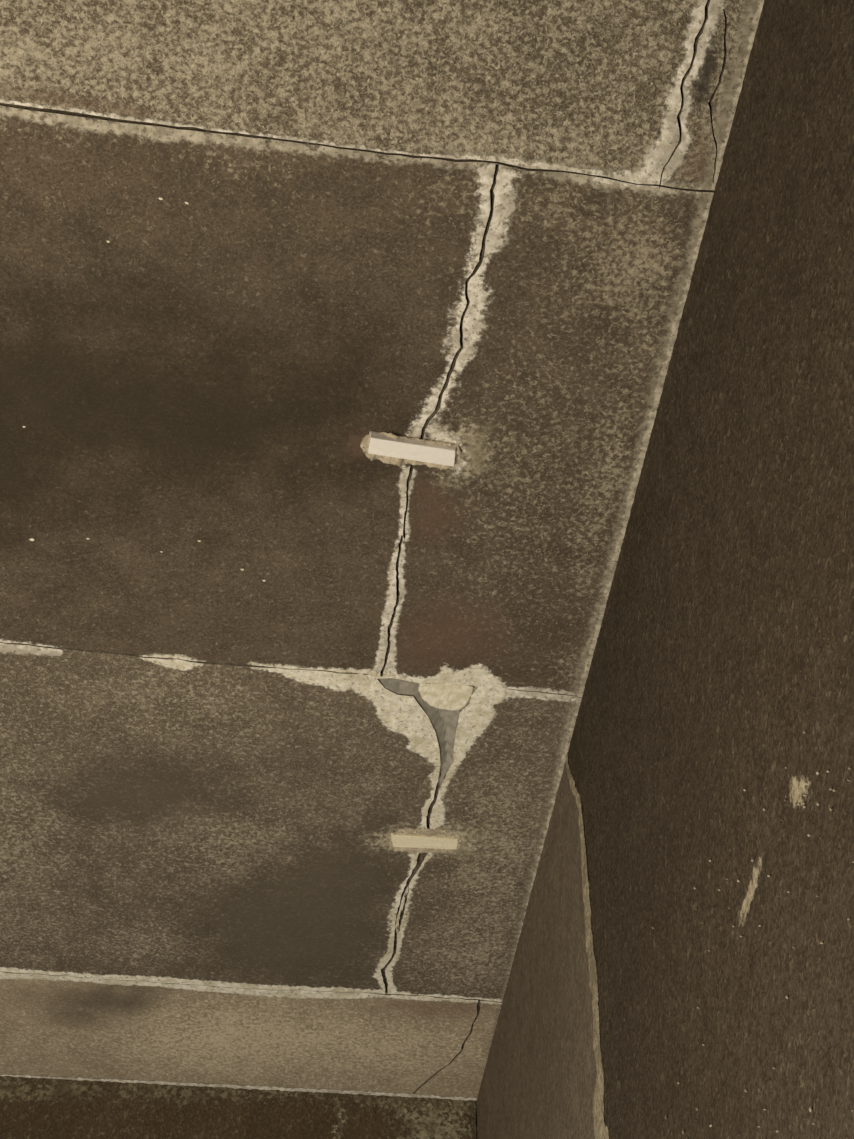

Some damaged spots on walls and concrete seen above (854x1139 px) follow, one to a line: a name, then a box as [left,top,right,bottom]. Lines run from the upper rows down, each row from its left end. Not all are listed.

crack [592,0,727,189]
crack [373,164,522,676]
spalling [349,664,508,786]
crack [372,763,458,995]
crack [413,999,481,1094]